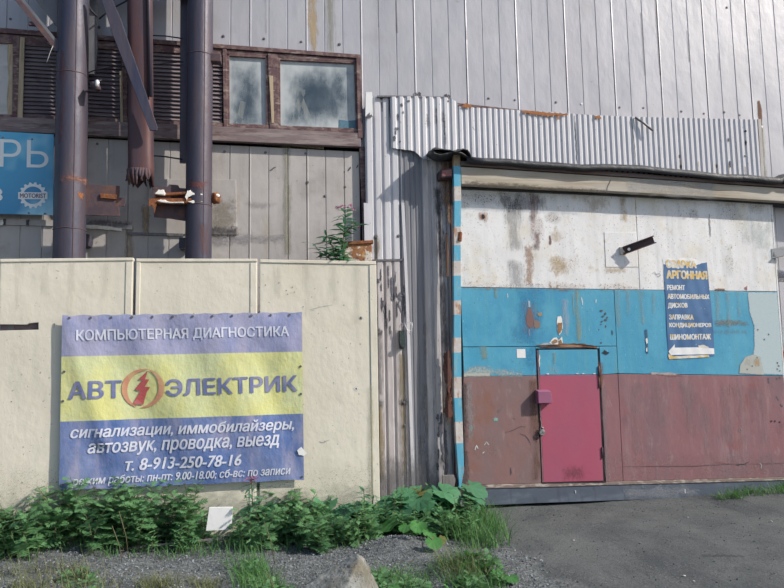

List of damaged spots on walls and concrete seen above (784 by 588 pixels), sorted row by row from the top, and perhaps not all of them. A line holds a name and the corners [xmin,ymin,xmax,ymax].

corrosion [308,0,317,51]
corrosion [522,110,568,120]
peeling [541,316,563,345]
peeling [739,354,781,383]